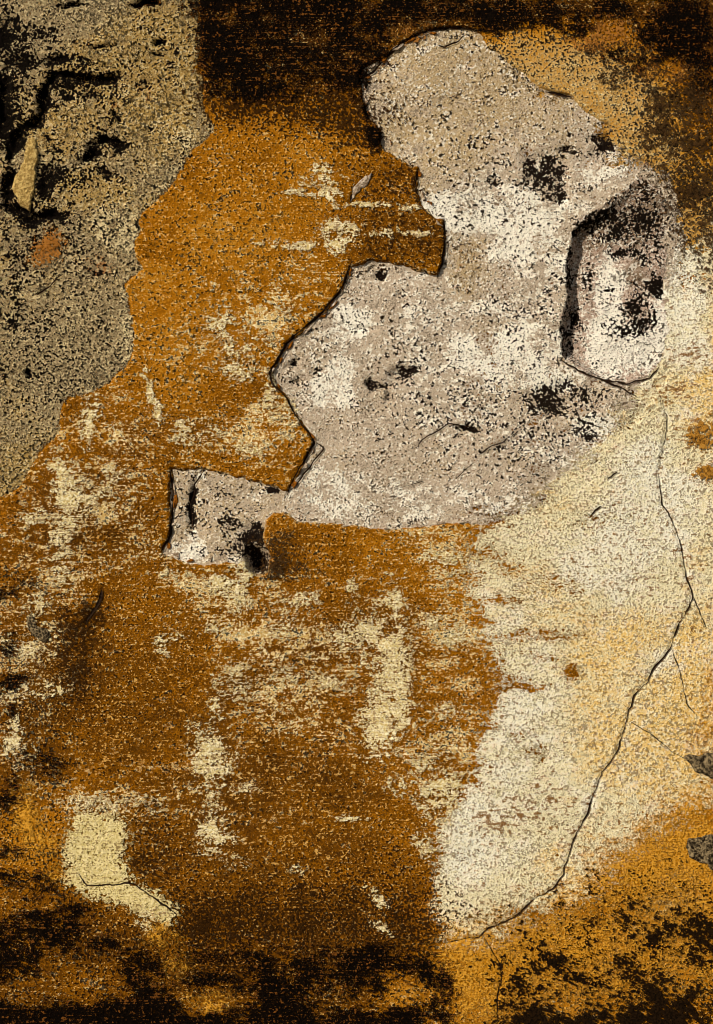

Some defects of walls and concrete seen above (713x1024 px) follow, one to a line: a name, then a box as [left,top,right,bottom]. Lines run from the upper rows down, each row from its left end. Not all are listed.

damp [127,0,713,273]
corrosion [27,222,68,270]
spalling [139,29,713,955]
crack [429,358,706,1024]
corrosion [686,673,713,756]
corrosion [11,782,71,884]
crack [79,874,176,914]
corrosion [144,913,190,978]
damp [0,806,713,1024]
corrosion [428,793,713,1024]
corrosion [180,991,231,1013]